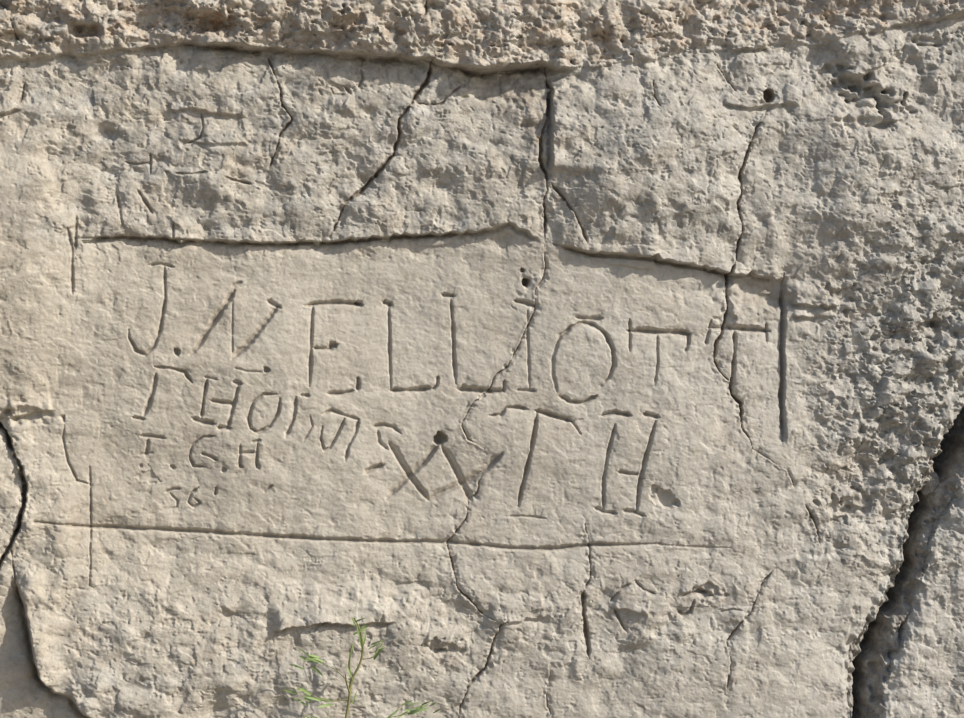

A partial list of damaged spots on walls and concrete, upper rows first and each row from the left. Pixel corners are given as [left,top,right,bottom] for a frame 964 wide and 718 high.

crack [266,54,294,172]
crack [329,53,463,239]
crack [446,65,590,718]
crack [713,109,822,547]
crack [0,420,29,622]
crack [580,522,593,661]
crack [725,567,776,696]
crack [847,406,964,718]